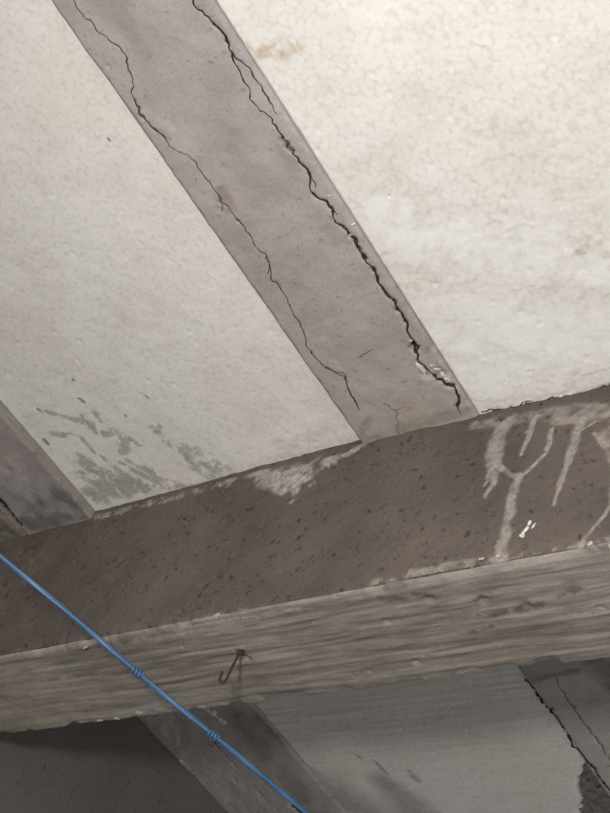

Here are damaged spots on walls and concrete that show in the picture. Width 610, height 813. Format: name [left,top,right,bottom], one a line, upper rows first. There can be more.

crack [74,0,360,410]
crack [192,0,461,413]
crack [481,395,565,413]
crack [0,498,23,525]
crack [524,678,610,793]
spalling [578,763,610,813]